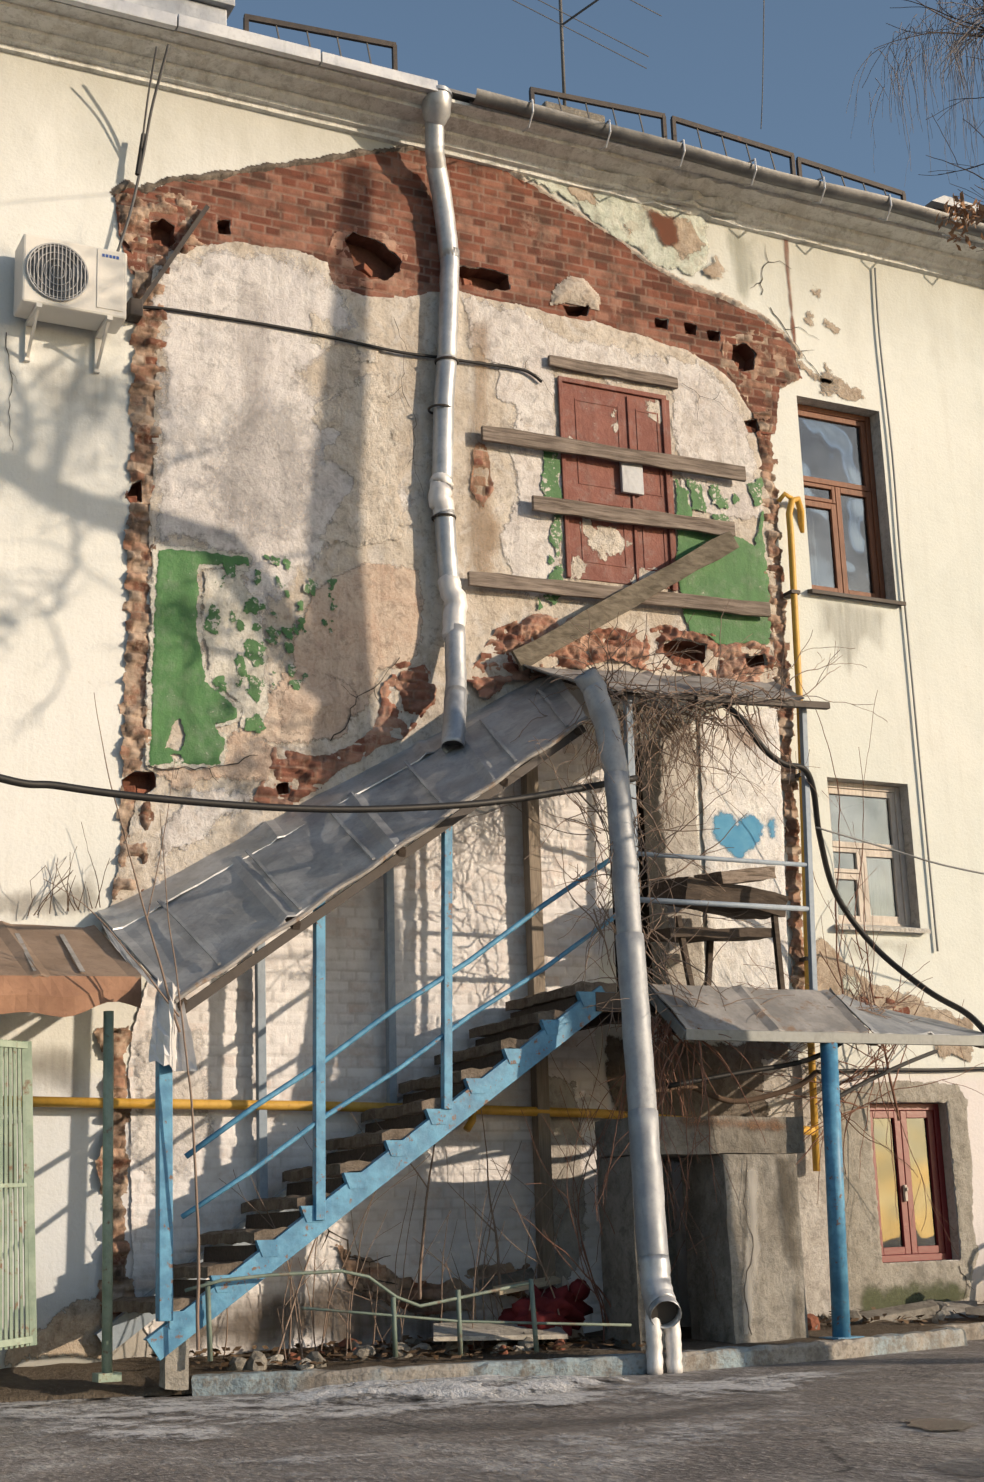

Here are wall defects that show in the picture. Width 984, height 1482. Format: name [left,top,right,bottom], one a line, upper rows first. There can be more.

crack [5,332,17,442]
flaking render [101,146,446,936]
flaking render [445,156,864,717]
flaking render [771,707,974,1062]
flaking render [4,1025,135,1368]
spalling [335,1244,530,1316]